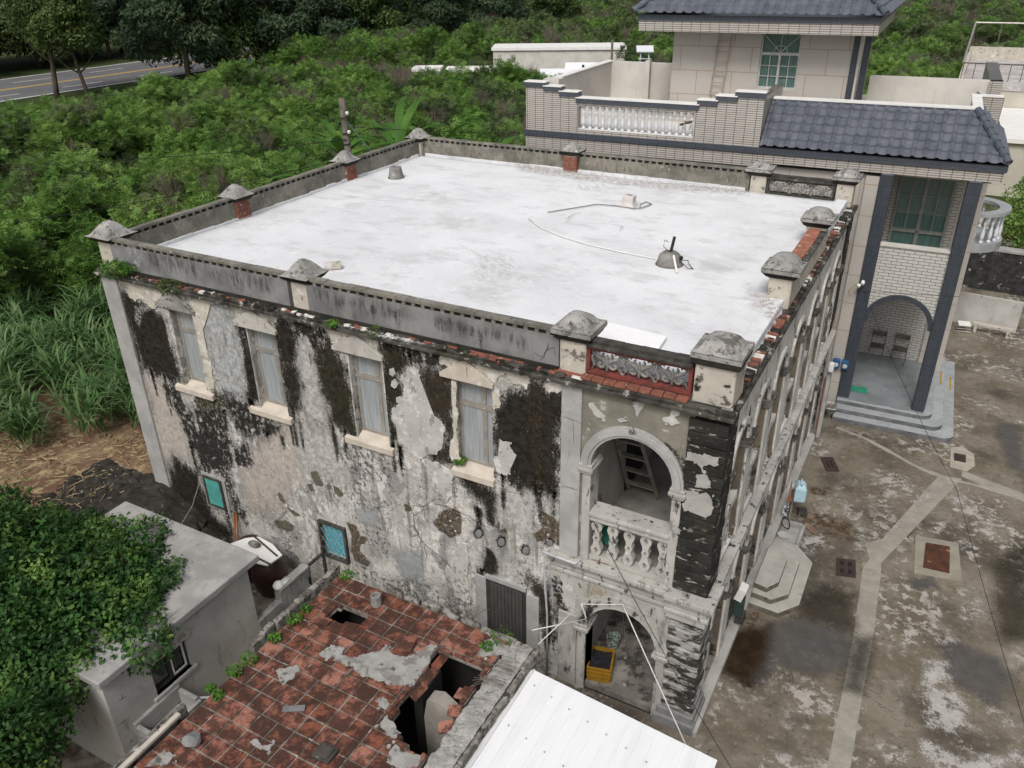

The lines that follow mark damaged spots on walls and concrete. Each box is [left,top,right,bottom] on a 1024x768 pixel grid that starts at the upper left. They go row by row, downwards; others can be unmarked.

water stain [340,323,440,366]
water stain [121,289,330,542]
peeling [589,401,645,423]
peeling [662,410,681,426]
peeling [389,367,463,538]
water stain [459,377,562,535]
spalling [305,471,343,499]
peeling [682,452,719,518]
spalling [346,522,370,567]